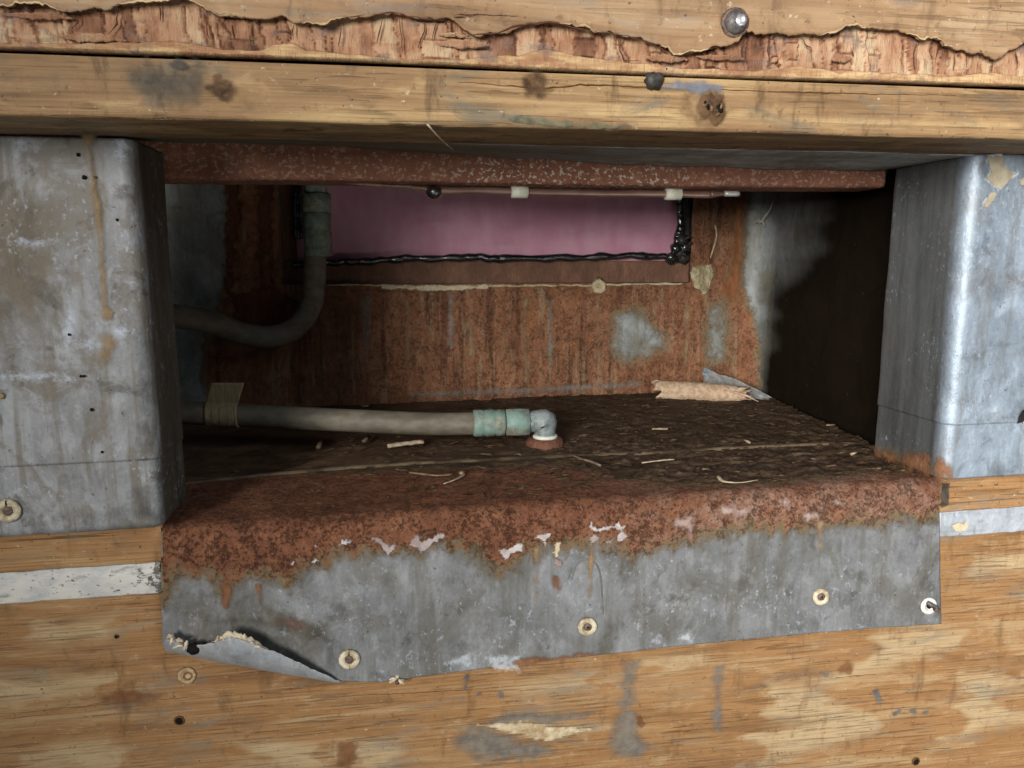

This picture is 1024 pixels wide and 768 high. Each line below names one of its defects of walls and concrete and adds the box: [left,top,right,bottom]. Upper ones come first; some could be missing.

peeling [3,11,74,21]
peeling [436,31,488,50]
peeling [983,154,1024,208]
corrosion [82,175,112,319]
corrosion [200,185,761,407]
peeling [371,538,396,555]
peeling [410,533,445,552]
peeling [499,543,523,559]
peeling [536,533,562,567]
corrosion [161,450,953,609]
peeling [589,522,628,545]